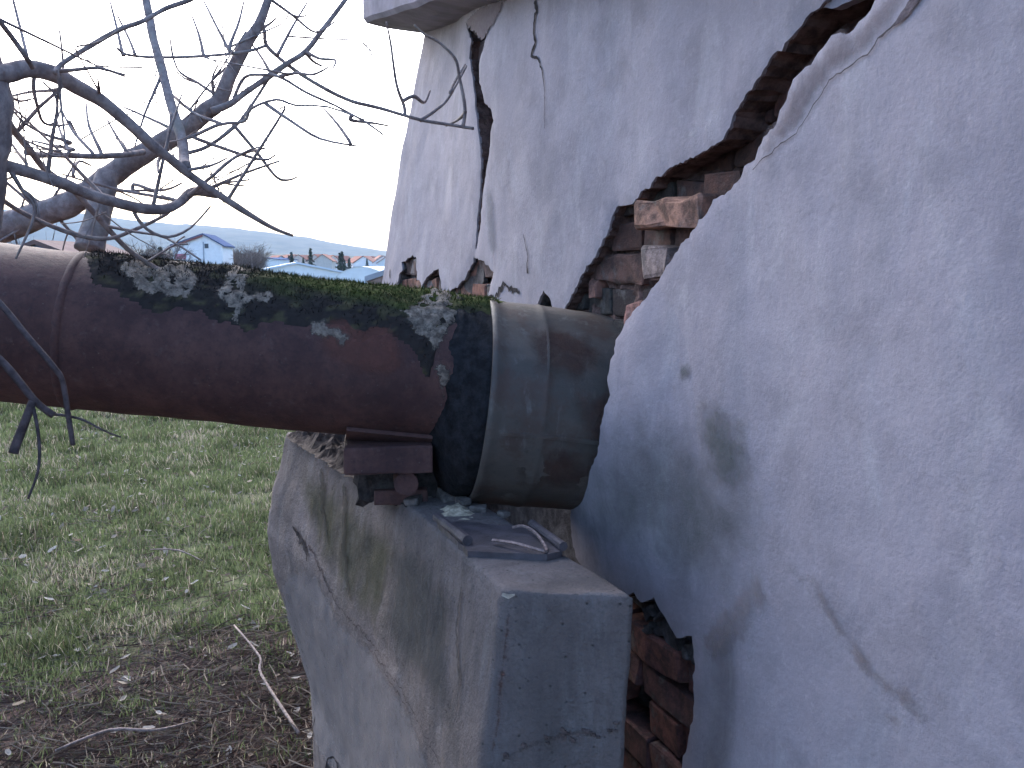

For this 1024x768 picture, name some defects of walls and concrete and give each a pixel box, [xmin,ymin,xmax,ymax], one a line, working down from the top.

crack [467,0,505,236]
crack [530,0,545,127]
corrosion [323,322,399,371]
peeling [399,246,494,397]
crack [293,527,441,768]
spalling [543,596,695,768]